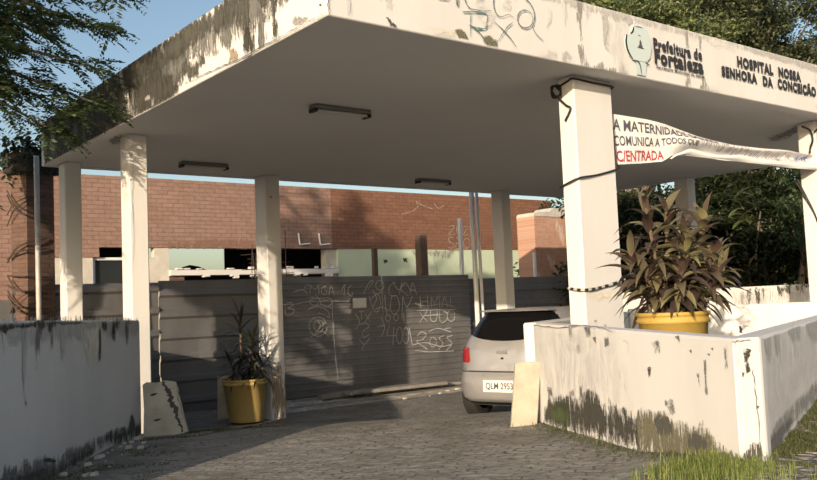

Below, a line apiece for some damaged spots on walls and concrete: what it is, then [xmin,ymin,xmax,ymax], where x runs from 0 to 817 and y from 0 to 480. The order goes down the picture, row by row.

leakage [428,26,467,38]
leakage [475,0,498,47]
leakage [540,0,817,83]
leakage [44,0,288,164]
leakage [732,283,810,305]
leakage [0,315,139,390]
crack [161,381,184,432]
leakage [0,414,141,480]